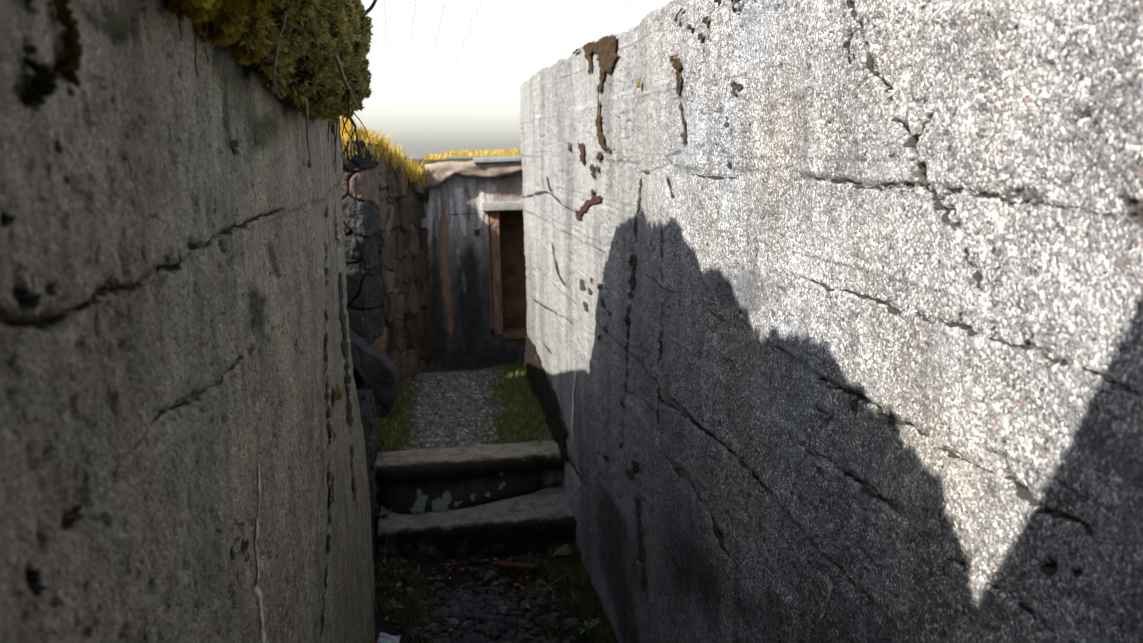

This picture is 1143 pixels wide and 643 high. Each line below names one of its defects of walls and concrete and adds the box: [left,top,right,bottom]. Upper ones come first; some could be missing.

crack [843,0,932,154]
crack [7,210,279,330]
crack [519,176,575,212]
crack [533,299,573,324]
crack [551,242,565,286]
crack [619,100,767,557]
crack [794,177,1115,287]
crack [782,270,1140,395]
crack [137,355,244,447]
crack [799,377,1101,543]
crack [946,557,1054,633]